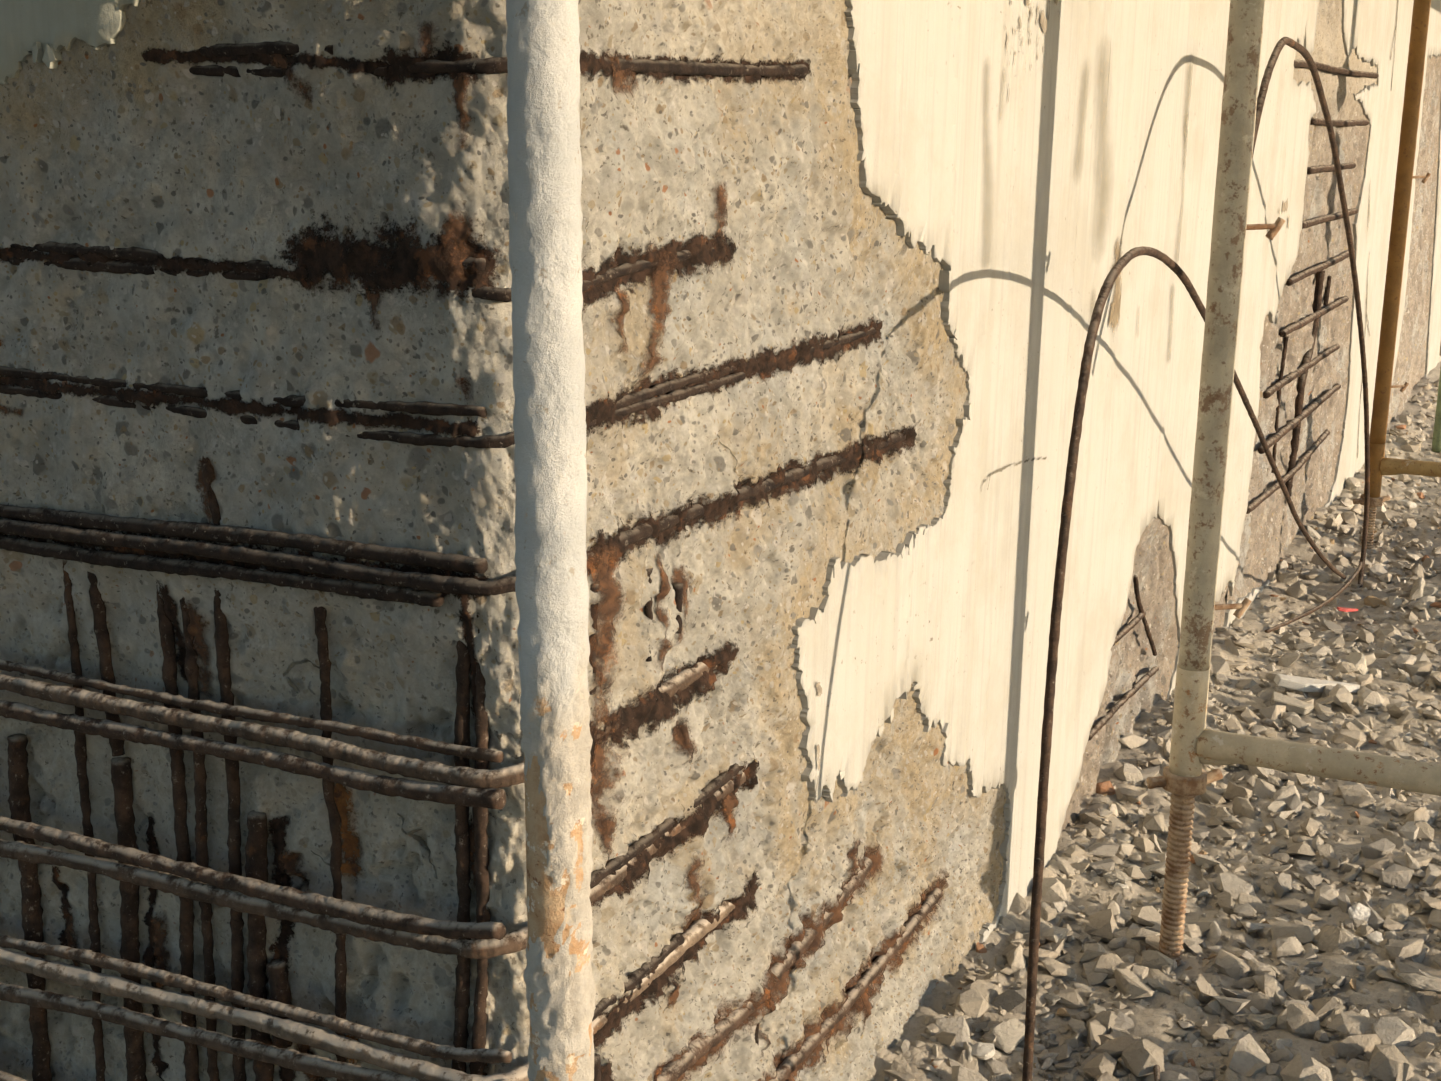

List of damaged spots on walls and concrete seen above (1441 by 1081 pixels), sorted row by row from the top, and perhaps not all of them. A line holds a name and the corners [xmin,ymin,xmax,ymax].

rust [141,21,479,149]
peeling [1006,0,1060,71]
rust [0,211,506,330]
spalling [1213,0,1379,633]
rust [0,505,490,722]
spalling [0,0,530,1081]
rust [586,425,917,913]
spalling [578,0,1007,1081]
spalling [1022,246,1206,1081]
rust [142,888,170,1079]
rust [593,858,760,1081]
rust [654,841,949,1081]